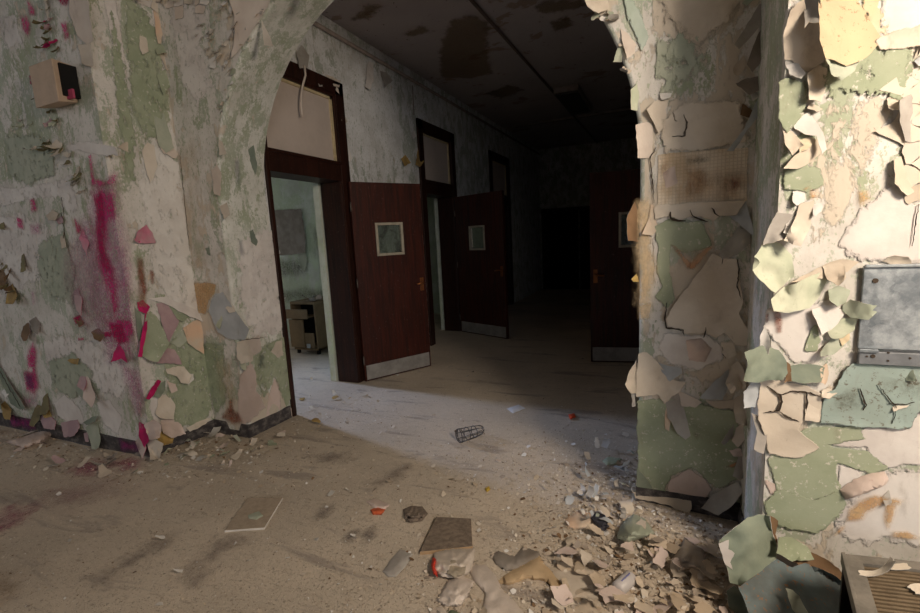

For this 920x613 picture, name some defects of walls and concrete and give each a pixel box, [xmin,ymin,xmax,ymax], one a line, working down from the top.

peeling [536,0,636,74]
spalling [0,0,294,478]
crack [765,386,819,421]